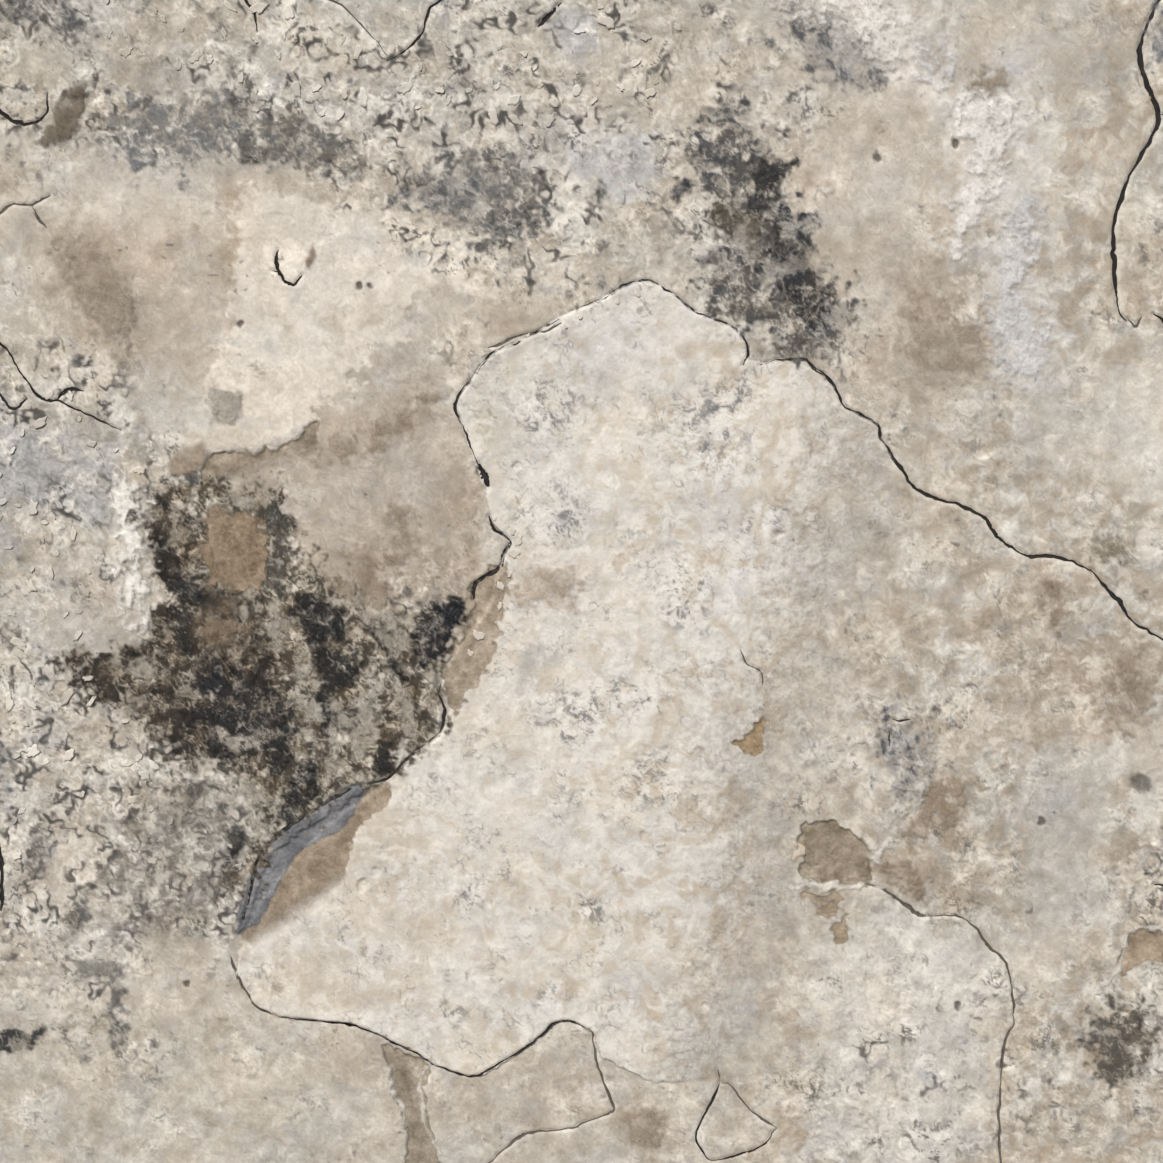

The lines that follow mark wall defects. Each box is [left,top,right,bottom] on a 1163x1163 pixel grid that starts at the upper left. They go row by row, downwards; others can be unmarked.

leakage [672,97,858,367]
crack [1110,0,1163,328]
leakage [39,437,72,461]
crack [0,342,121,430]
crack [453,279,1163,641]
leakage [28,809,53,878]
leakage [57,884,91,937]
peeling [146,843,232,906]
leakage [52,444,473,927]
crack [230,956,615,1163]
peeling [234,281,890,1163]
crack [864,883,1016,1163]